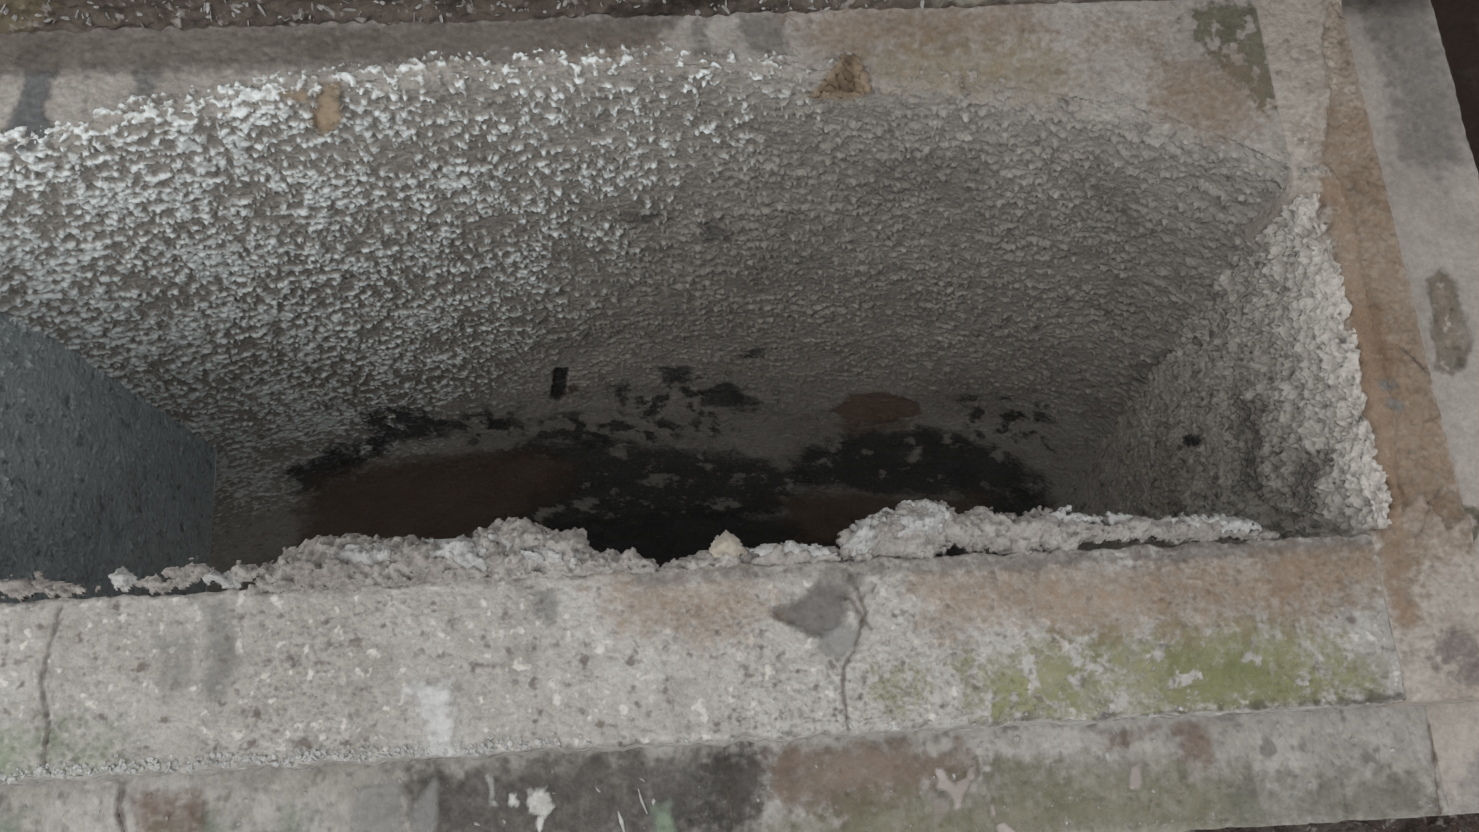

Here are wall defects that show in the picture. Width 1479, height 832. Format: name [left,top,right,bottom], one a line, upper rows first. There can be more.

damp [288,367,1064,583]
crack [840,576,872,721]